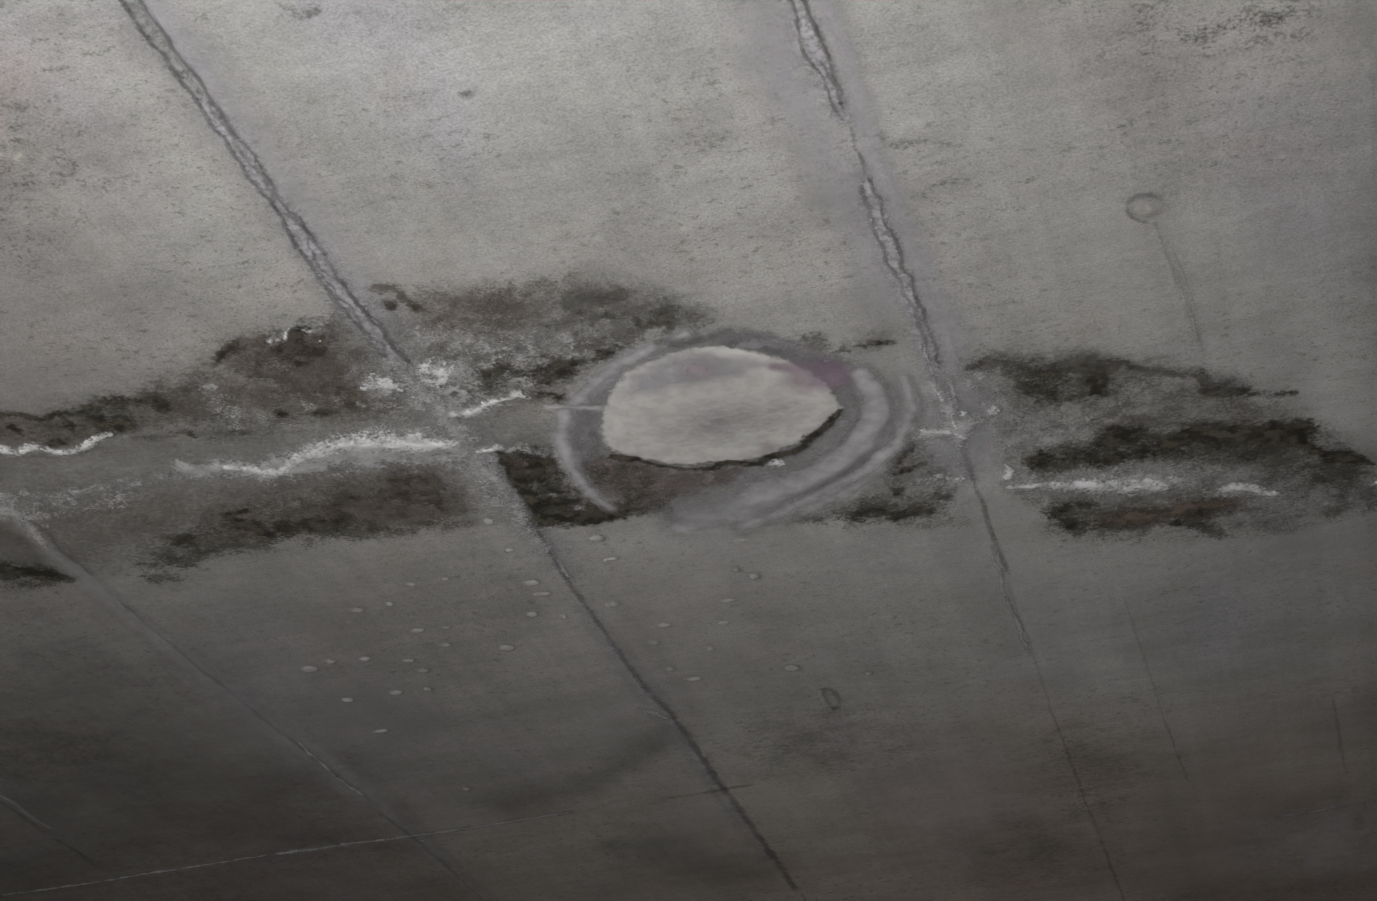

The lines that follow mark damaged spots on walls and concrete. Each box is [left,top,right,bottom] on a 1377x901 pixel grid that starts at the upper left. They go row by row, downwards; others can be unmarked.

crack [791,0,852,124]
crack [0,492,53,551]
leakage [0,273,688,587]
crack [120,0,575,582]
leakage [798,332,894,352]
crack [859,174,961,431]
leakage [786,352,1375,539]